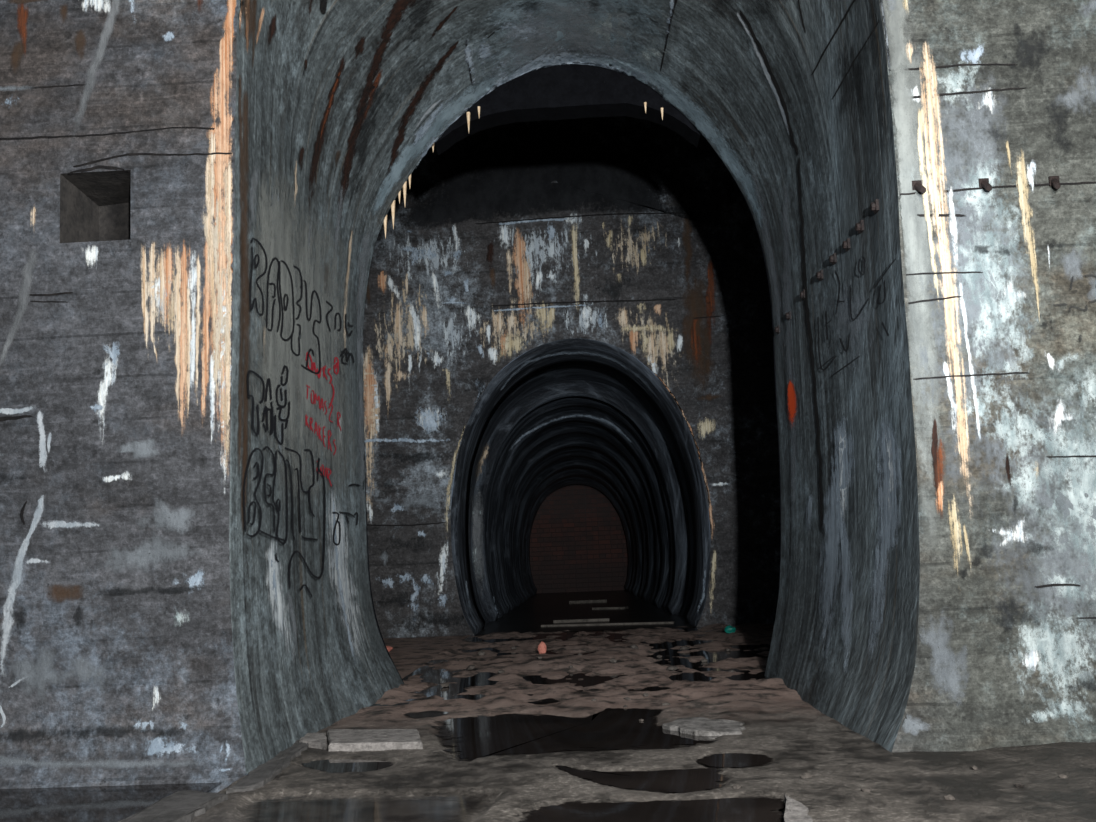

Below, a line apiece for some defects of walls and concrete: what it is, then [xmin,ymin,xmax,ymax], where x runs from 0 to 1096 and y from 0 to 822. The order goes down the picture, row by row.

leakage [76,0,134,121]
rust [294,0,417,223]
rust [387,42,458,175]
leakage [837,0,1096,722]
rust [931,420,944,513]
leakage [806,419,855,670]
efflorescence [903,719,924,734]